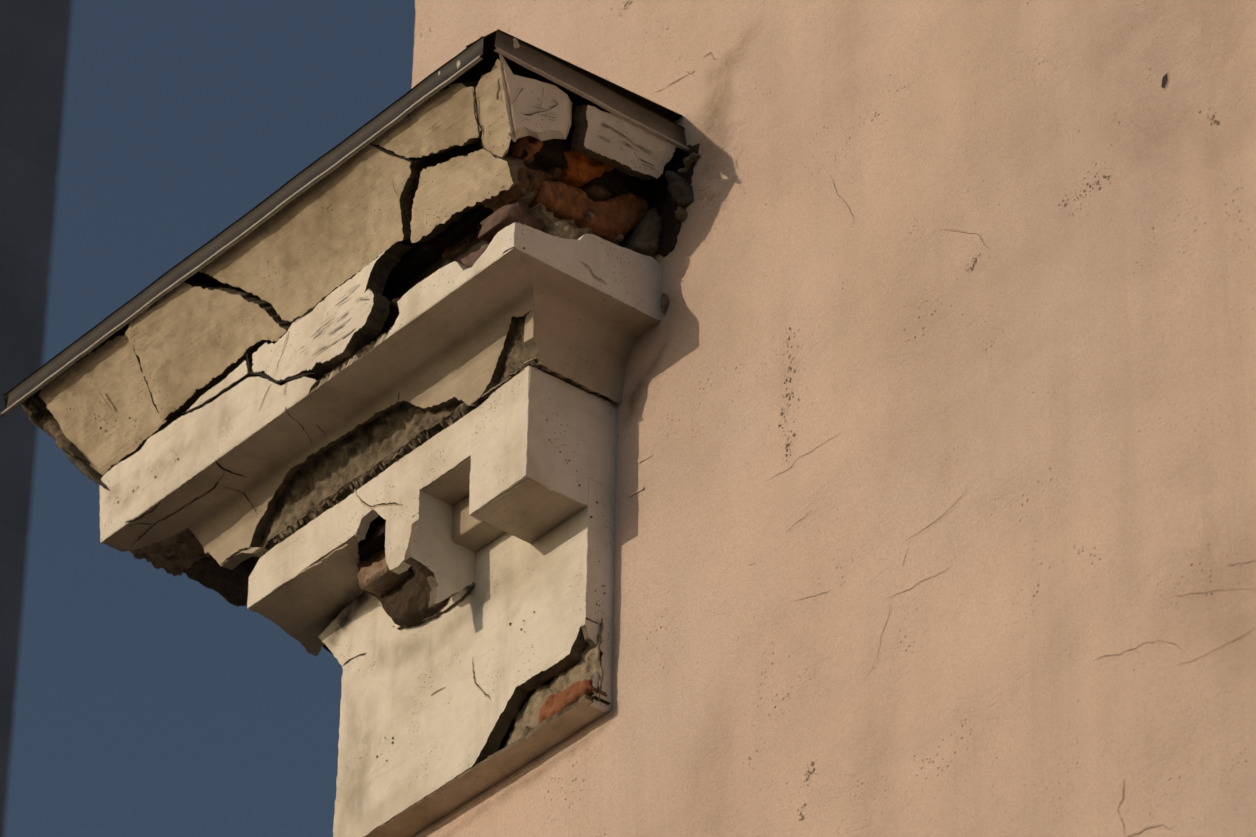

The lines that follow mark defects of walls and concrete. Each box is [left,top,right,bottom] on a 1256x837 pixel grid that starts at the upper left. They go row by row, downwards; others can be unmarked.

crack [370,78,558,199]
spalling [429,123,701,268]
crack [580,262,607,285]
crack [133,256,378,448]
spalling [369,298,401,344]
crack [473,377,511,404]
crack [125,460,258,546]
spalling [259,402,476,554]
crack [354,489,403,510]
spalling [123,529,252,607]
spalling [357,549,449,628]
spalling [500,585,611,750]